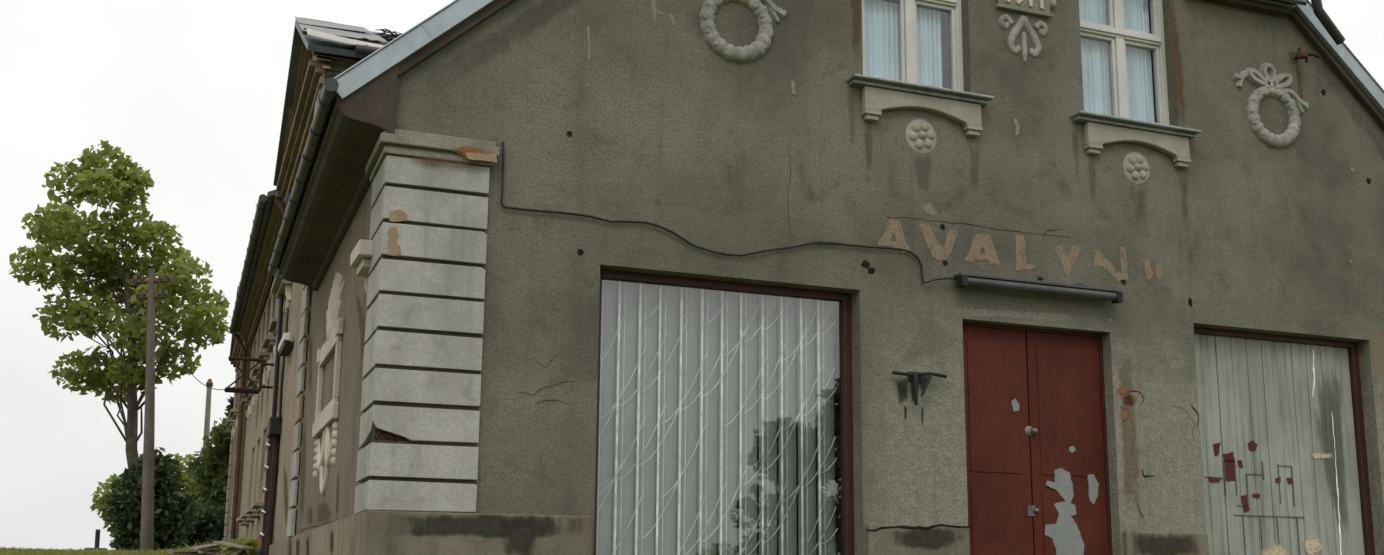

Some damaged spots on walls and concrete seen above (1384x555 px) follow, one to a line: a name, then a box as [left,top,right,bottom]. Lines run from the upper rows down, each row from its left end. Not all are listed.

spalling [387,209,407,256]
leakage [410,515,555,555]